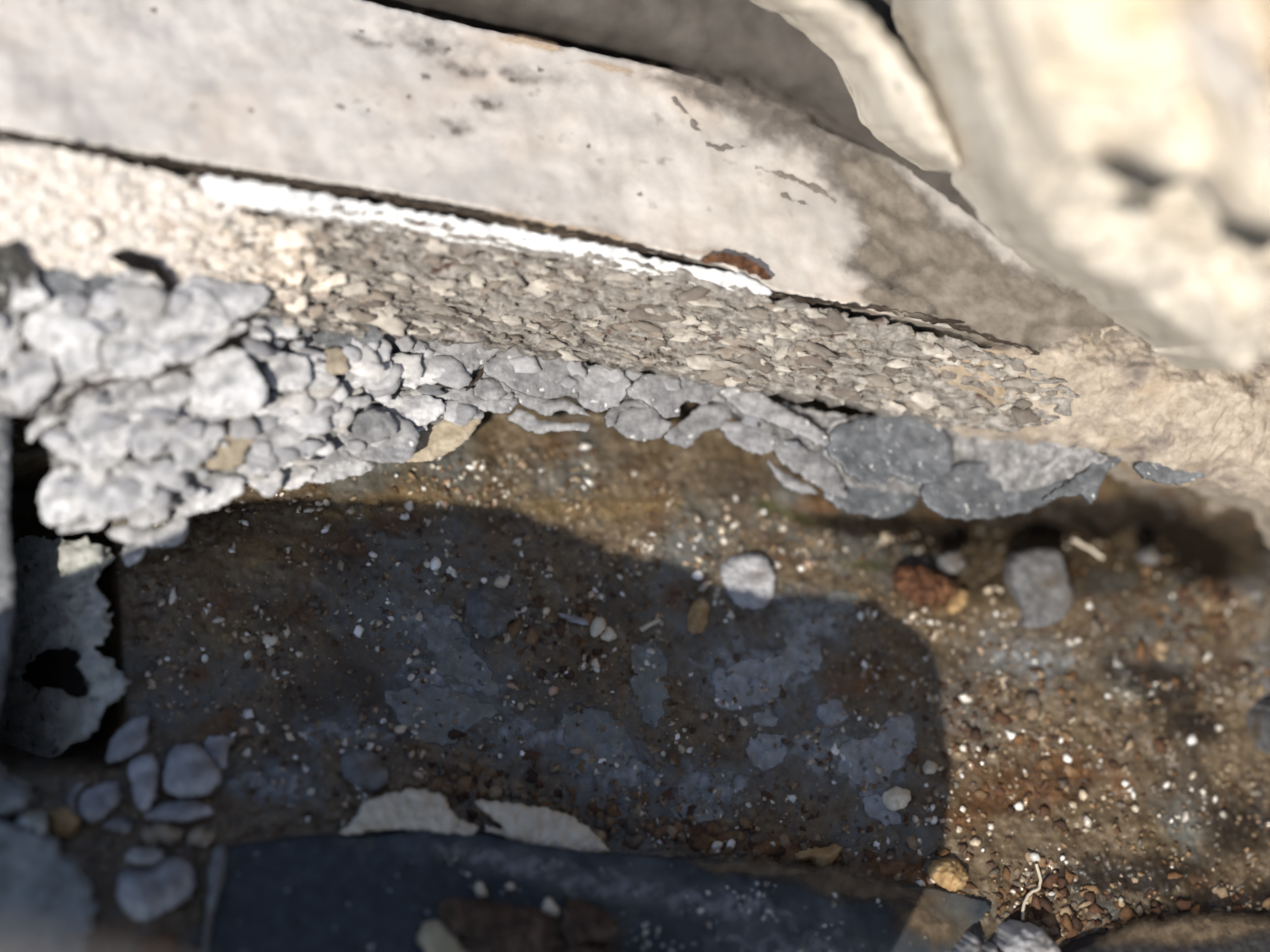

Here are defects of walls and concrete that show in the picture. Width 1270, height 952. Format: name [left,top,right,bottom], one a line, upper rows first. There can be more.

peeling [0,137,1205,777]
rust [941,753,1100,831]
rust [643,821,815,866]
rust [830,853,936,884]